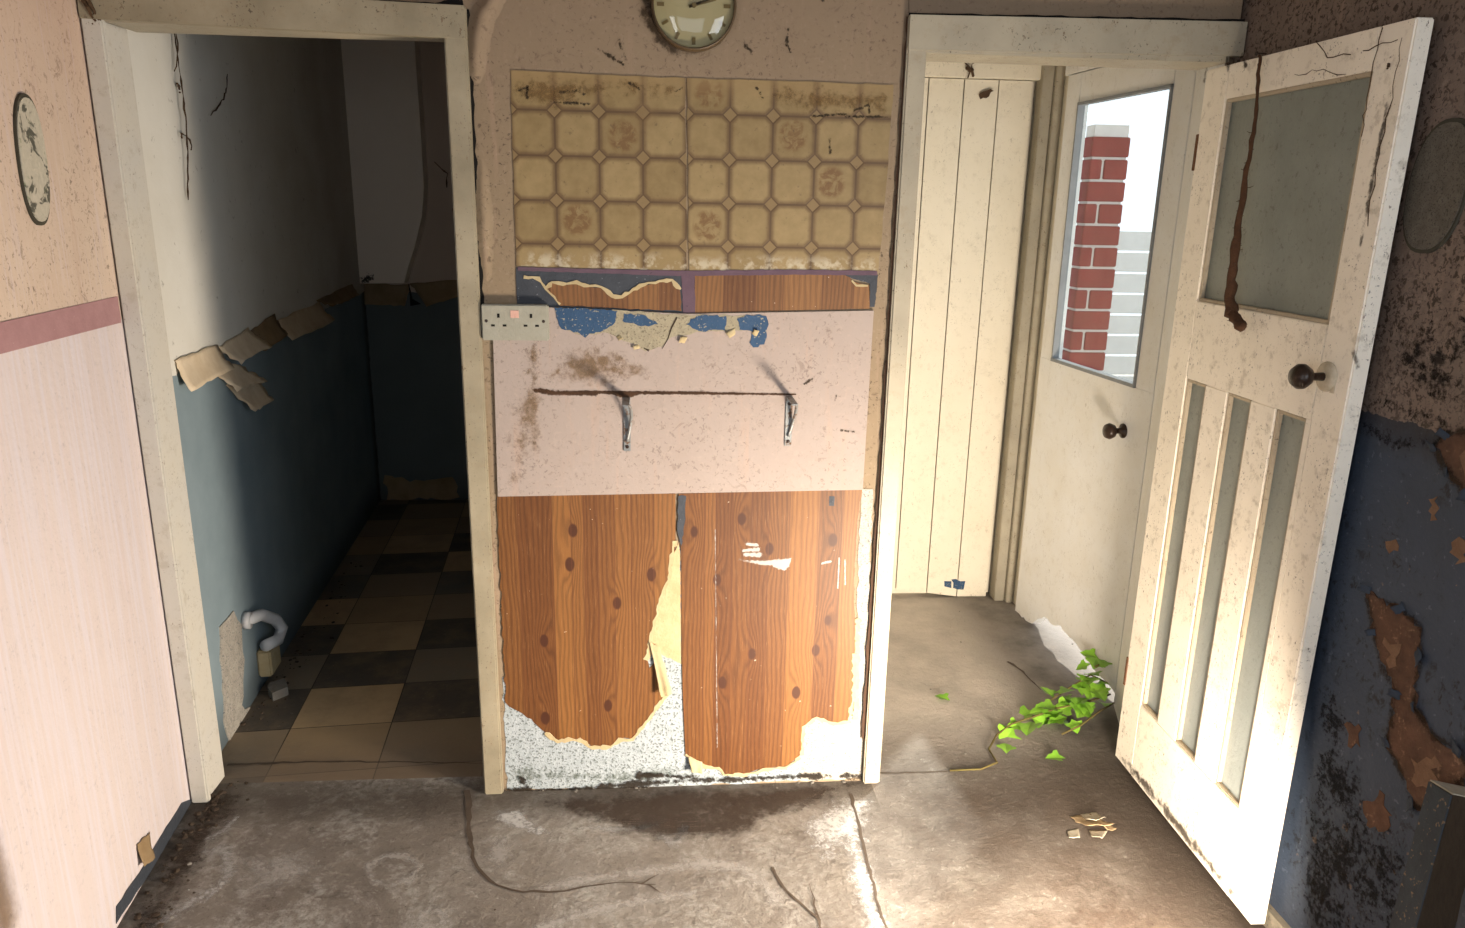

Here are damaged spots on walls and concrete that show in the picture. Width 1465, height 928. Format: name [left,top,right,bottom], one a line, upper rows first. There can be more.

peeling [554,307,769,352]
mould [1380,311,1465,425]
spalling [1425,427,1465,521]
flaking render [502,489,873,790]
spalling [1357,583,1465,832]
crack [227,760,659,893]
water stain [489,811,545,863]
water stain [504,771,884,928]
crack [771,867,821,928]
crack [848,793,888,928]
mould [1296,691,1404,928]